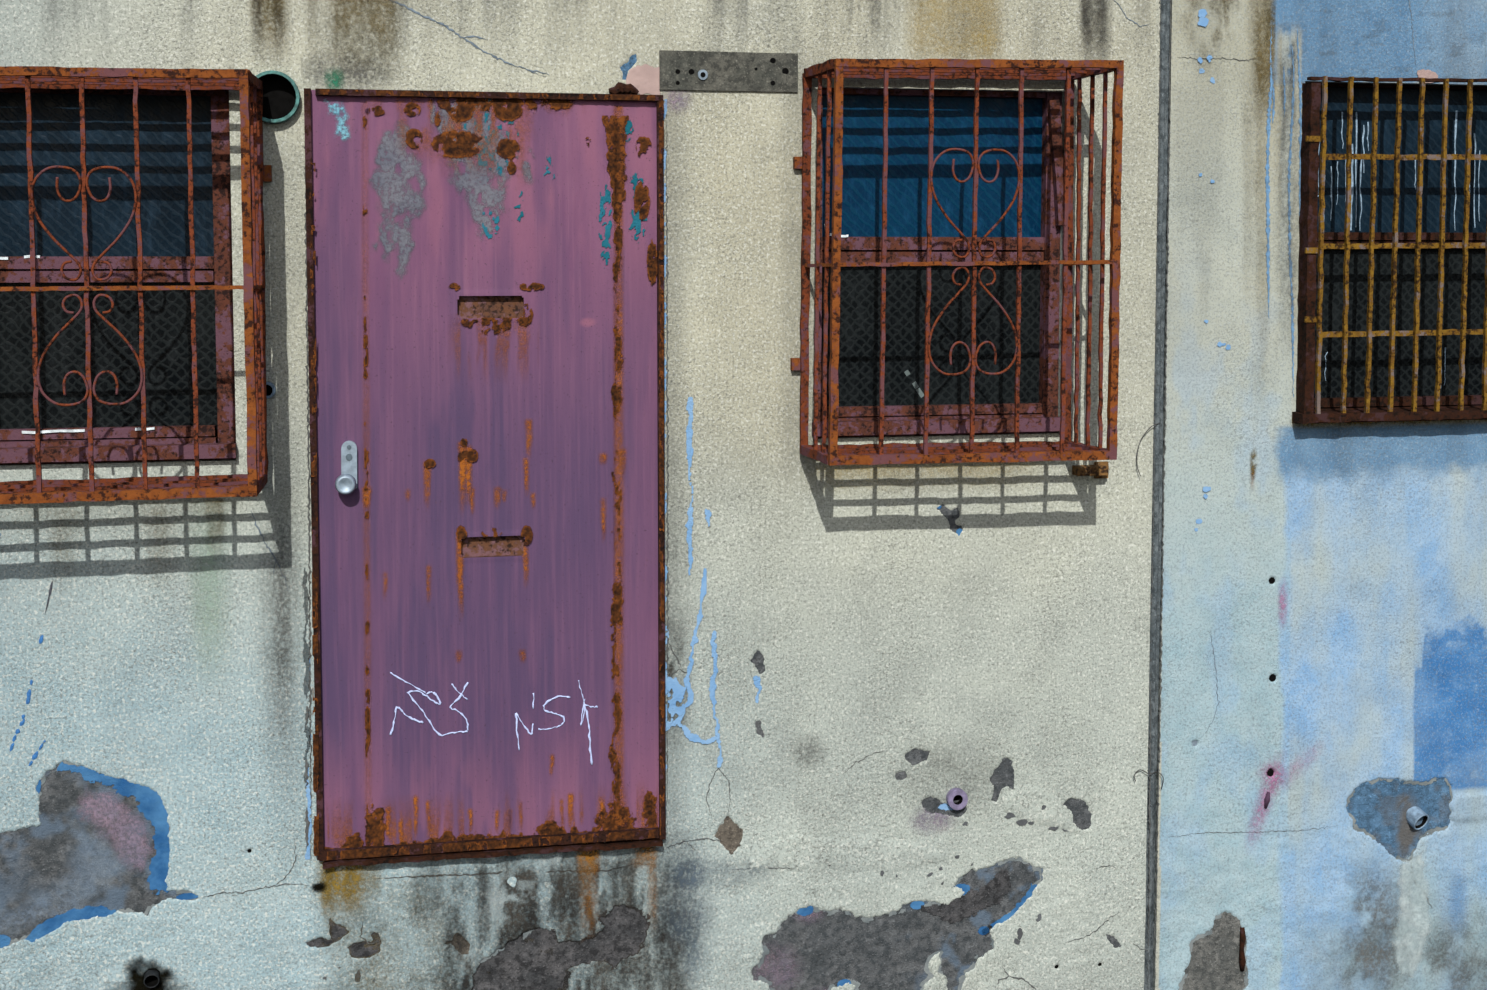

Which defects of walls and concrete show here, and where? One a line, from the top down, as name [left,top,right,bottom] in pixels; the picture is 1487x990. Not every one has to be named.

rust [313,89,665,903]
spalling [0,760,198,948]
water stain [126,958,172,990]
spalling [445,904,651,990]
water stain [444,848,705,990]
spalling [752,855,1043,990]
spalling [1178,912,1249,990]
spalling [1346,777,1453,862]